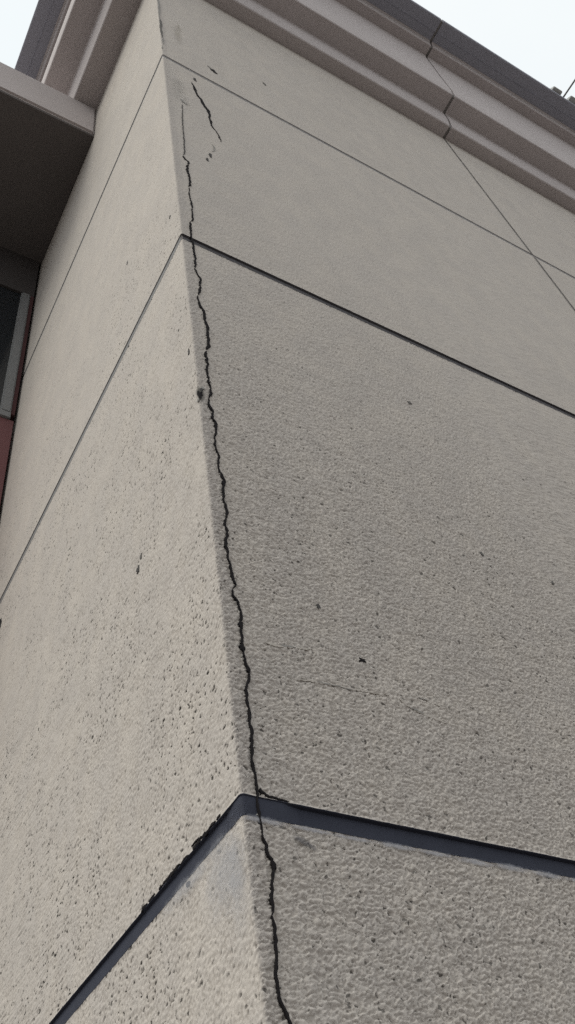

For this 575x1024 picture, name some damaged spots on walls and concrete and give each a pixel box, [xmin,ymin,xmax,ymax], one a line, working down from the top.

crack [181,78,292,1024]